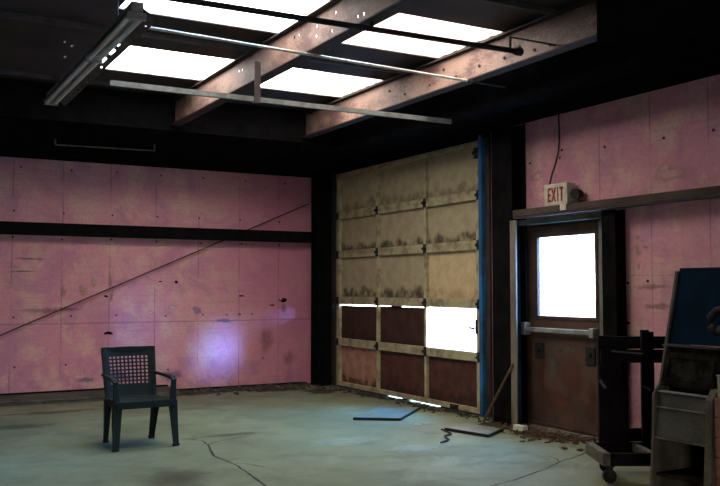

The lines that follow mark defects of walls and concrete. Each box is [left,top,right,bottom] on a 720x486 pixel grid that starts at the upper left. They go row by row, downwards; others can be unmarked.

crack [192,434,266,486]